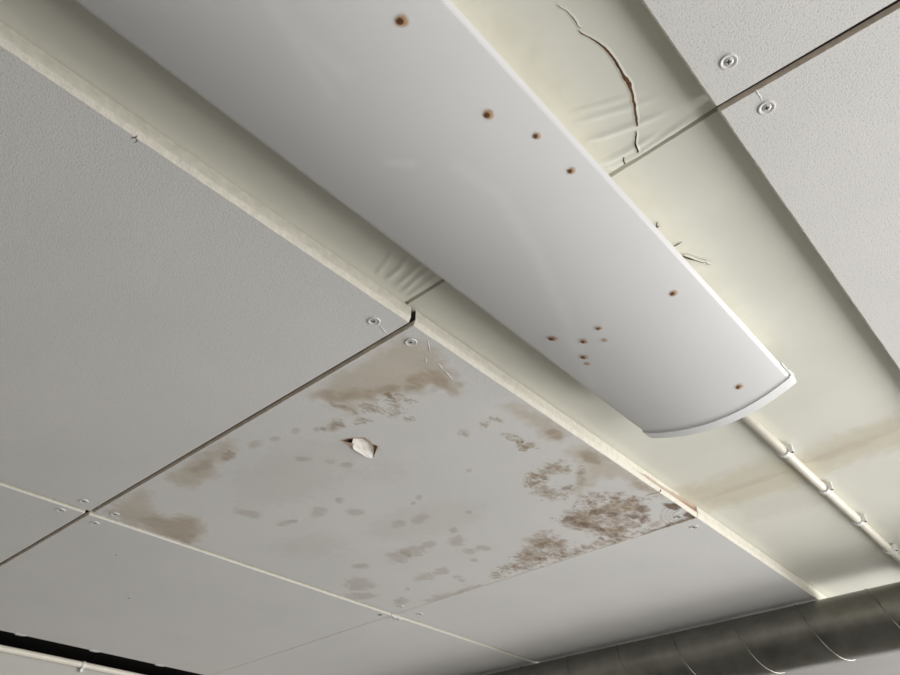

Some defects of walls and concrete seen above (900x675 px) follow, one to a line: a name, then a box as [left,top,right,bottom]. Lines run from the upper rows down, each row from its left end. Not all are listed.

crack [556,3,641,164]
crack [674,242,712,266]